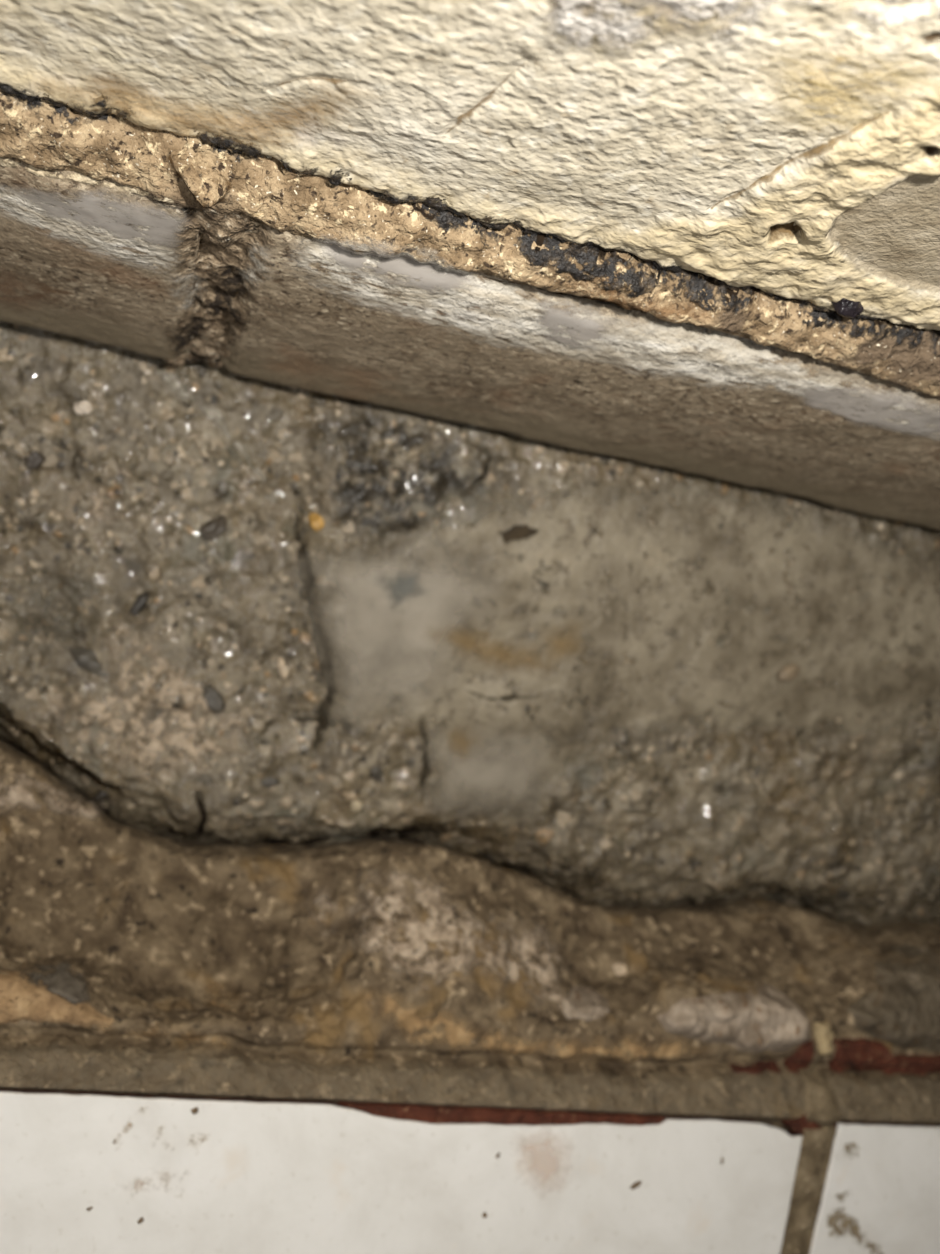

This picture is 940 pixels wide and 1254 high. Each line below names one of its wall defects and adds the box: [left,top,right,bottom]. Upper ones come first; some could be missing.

peeling [830,175,940,292]
crack [419,722,429,795]
spalling [0,774,105,819]
crack [190,796,207,839]
crack [257,835,333,845]
crack [368,827,437,844]
spalling [351,872,568,1009]